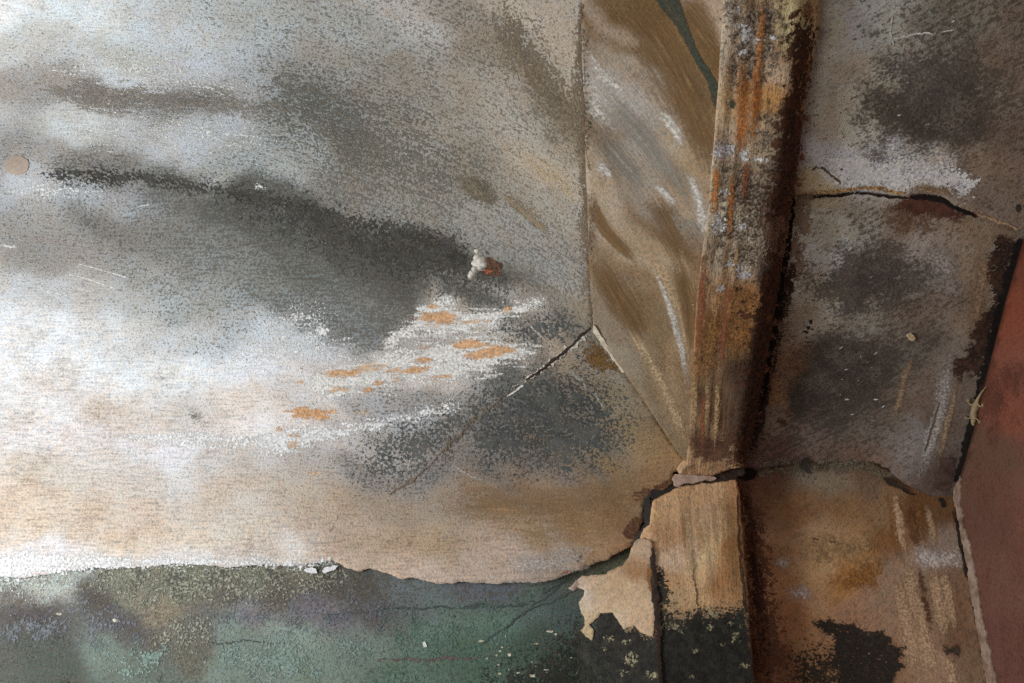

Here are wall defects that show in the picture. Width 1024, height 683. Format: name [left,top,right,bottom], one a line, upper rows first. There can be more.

peeling [304,565,338,574]
damp [7,47,643,577]
crack [389,3,598,495]
peeling [563,517,655,640]
corrosion [694,7,765,374]
damp [586,0,1012,471]
crack [631,166,1024,683]